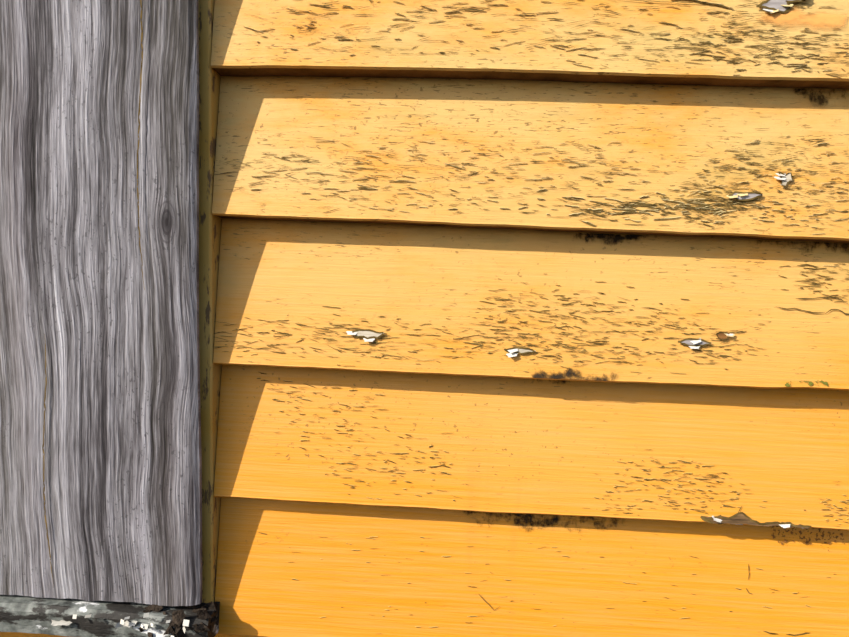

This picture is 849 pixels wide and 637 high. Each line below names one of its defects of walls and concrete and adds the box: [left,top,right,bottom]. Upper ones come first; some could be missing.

peeling [756,0,806,13]
crack [218,125,849,234]
peeling [774,172,793,187]
peeling [726,191,763,201]
crack [771,263,849,318]
peeling [346,329,384,342]
peeling [678,332,735,349]
peeling [504,347,536,358]
damp [486,512,619,531]
peeling [700,512,811,529]
peeling [51,614,92,626]
peeling [115,613,174,637]